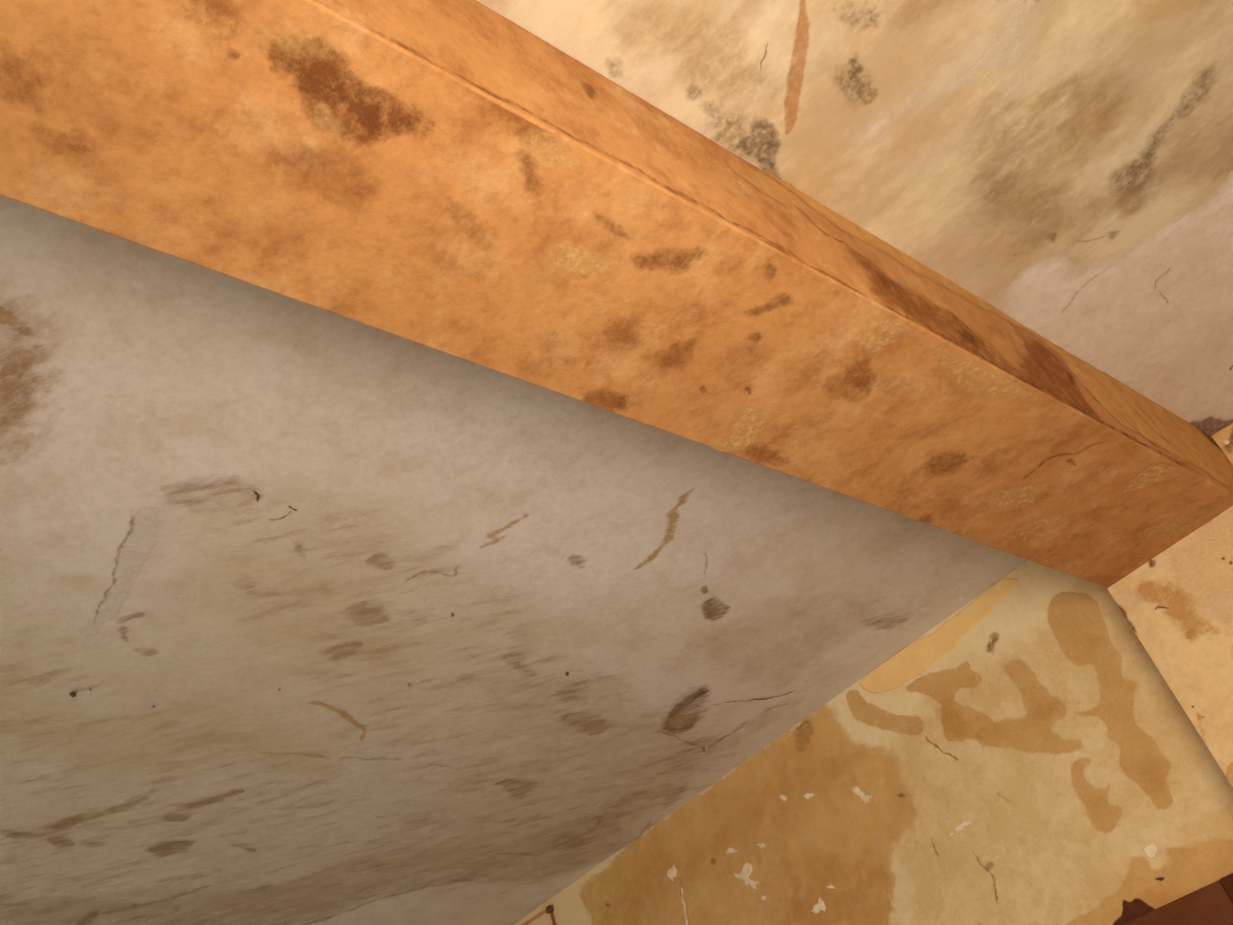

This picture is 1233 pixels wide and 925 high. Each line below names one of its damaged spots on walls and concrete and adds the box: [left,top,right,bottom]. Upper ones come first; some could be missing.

water stain [269,39,412,143]
water stain [478,0,1233,307]
water stain [635,491,690,569]
water stain [702,588,729,620]
water stain [0,509,706,925]
water stain [847,691,922,734]
water stain [581,706,916,925]
spalling [852,786,872,803]
spalling [725,847,767,901]
spalling [811,884,835,914]
spalling [1113,899,1155,925]